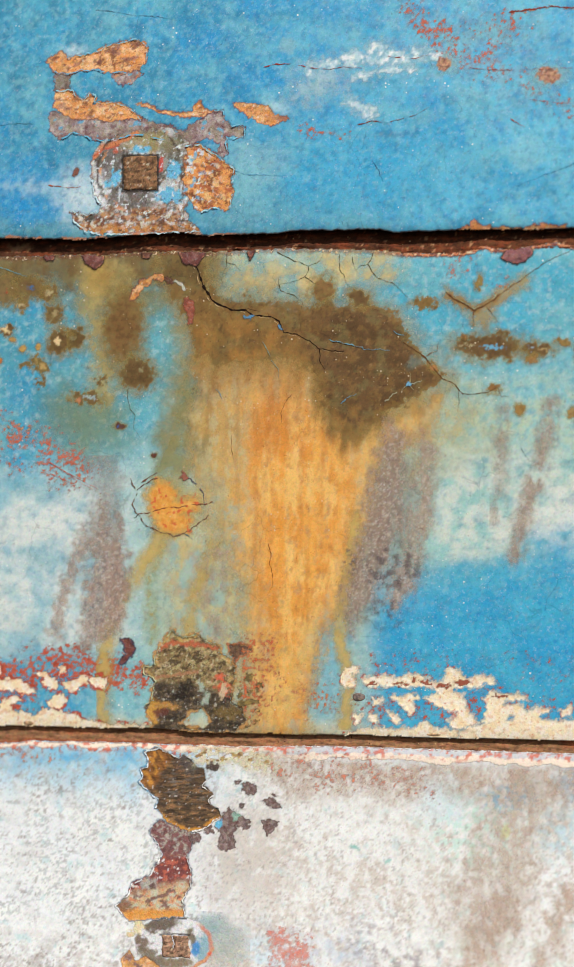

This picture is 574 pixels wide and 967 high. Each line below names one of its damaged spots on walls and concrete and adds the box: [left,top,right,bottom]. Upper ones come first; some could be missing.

peeling [46,38,289,236]
crack [193,259,368,368]
crack [277,252,415,308]
crack [443,252,567,325]
crack [403,342,509,405]
crack [130,470,213,537]
corrosion [0,251,455,734]
peeling [0,628,284,733]
peeling [0,653,574,967]